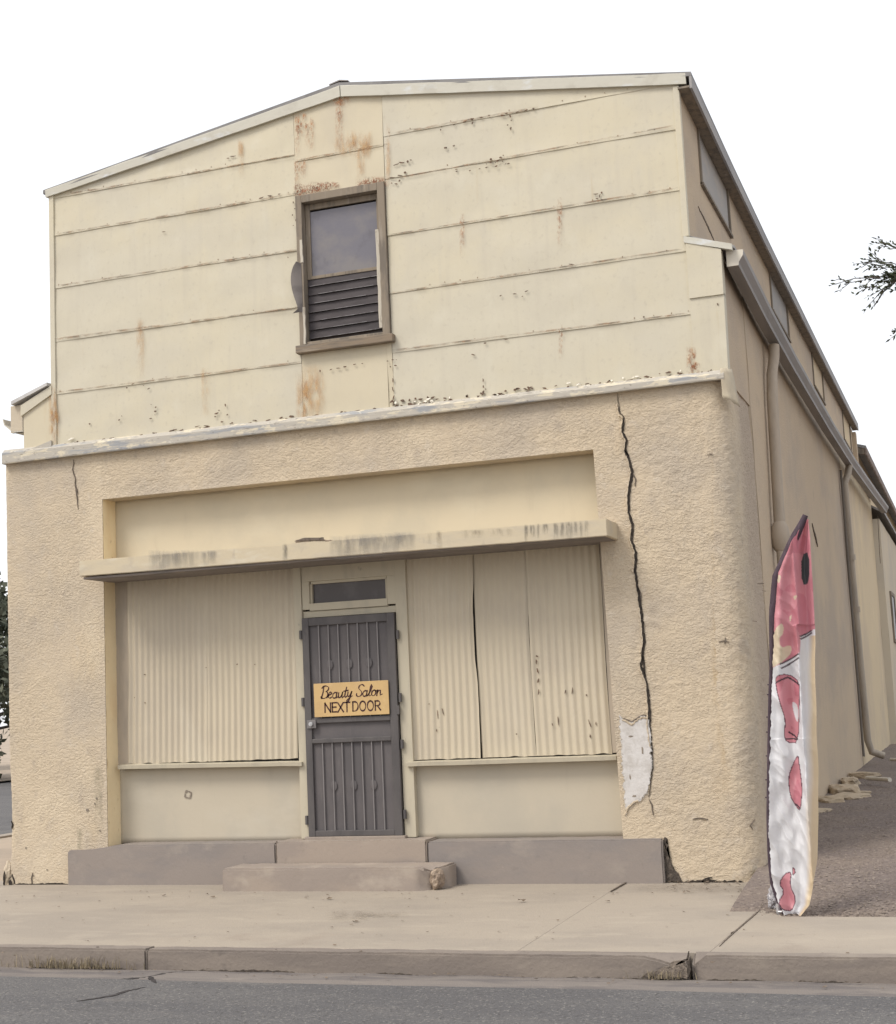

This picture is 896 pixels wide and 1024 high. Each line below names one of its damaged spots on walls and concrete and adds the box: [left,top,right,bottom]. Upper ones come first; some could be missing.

corrosion [295,154,338,195]
peeling [390,359,452,407]
peeling [466,370,682,397]
crack [71,460,79,507]
crack [615,403,654,815]
spalling [619,716,653,815]
spalling [429,868,445,890]
crack [567,951,762,981]
crack [798,977,844,985]